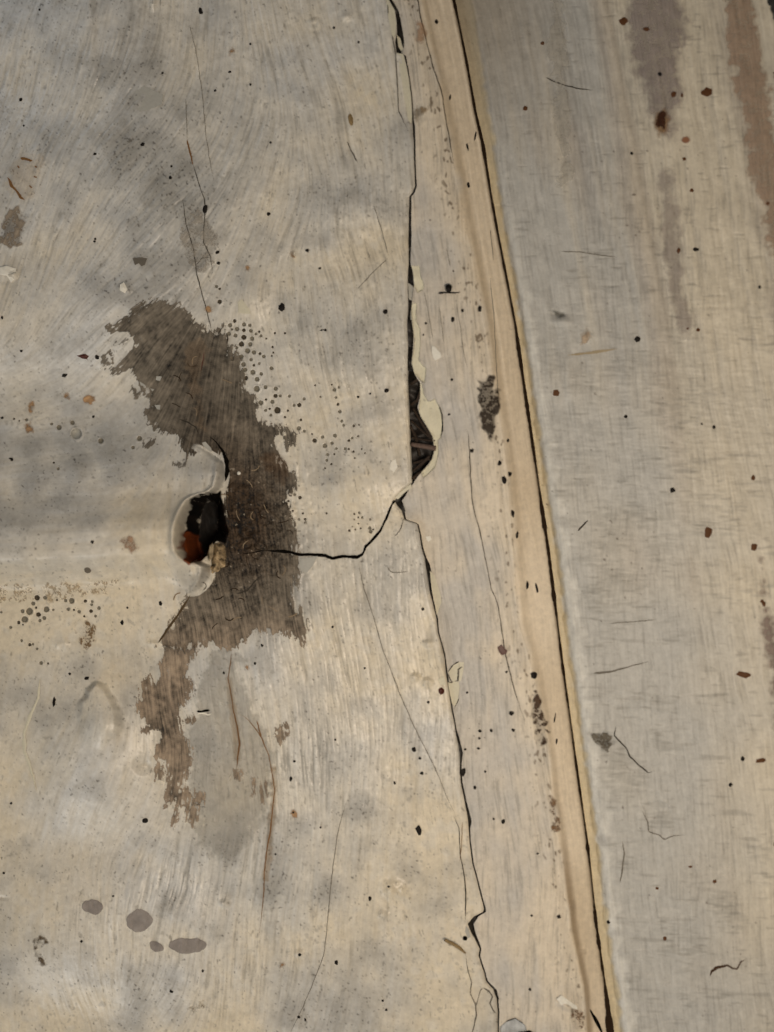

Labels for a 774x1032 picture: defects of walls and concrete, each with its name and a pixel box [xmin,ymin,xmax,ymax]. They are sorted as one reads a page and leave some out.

water stain [100,298,309,829]
crack [244,0,532,1032]
crack [452,0,615,1032]
crack [618,842,626,881]